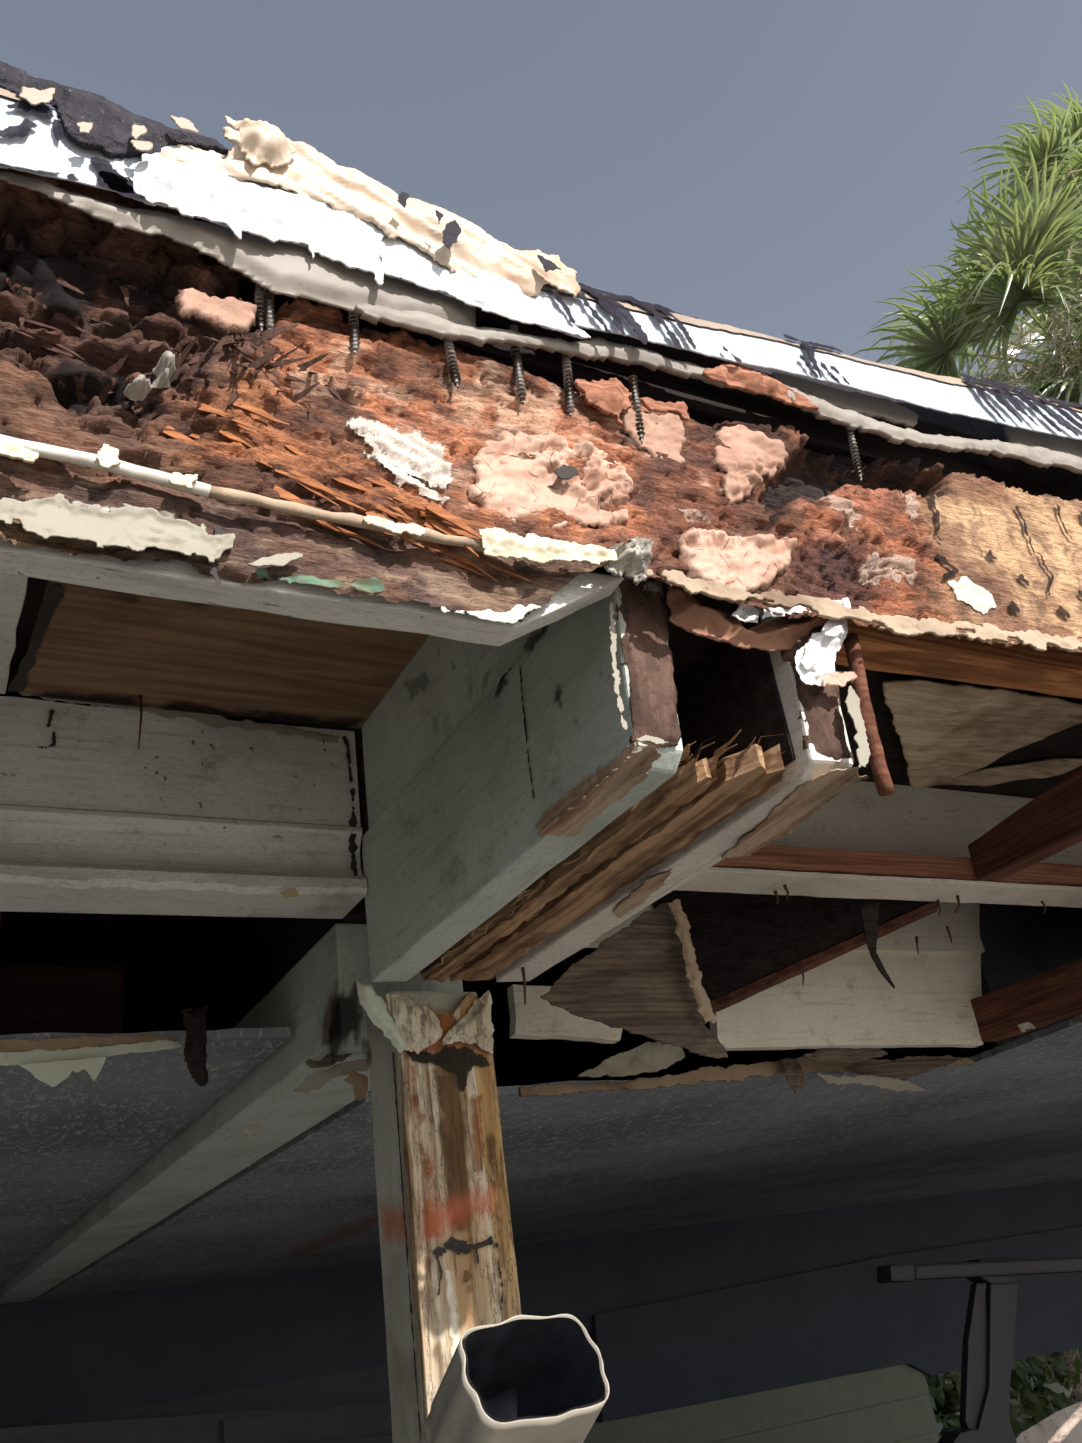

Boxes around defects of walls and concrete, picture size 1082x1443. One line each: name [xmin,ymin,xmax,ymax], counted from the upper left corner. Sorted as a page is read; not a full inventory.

peeling [19,86,55,106]
peeling [76,122,93,134]
peeling [130,115,591,339]
spalling [0,209,182,419]
peeling [0,493,235,563]
peeling [248,552,303,567]
peeling [440,604,541,624]
spalling [518,1055,975,1097]